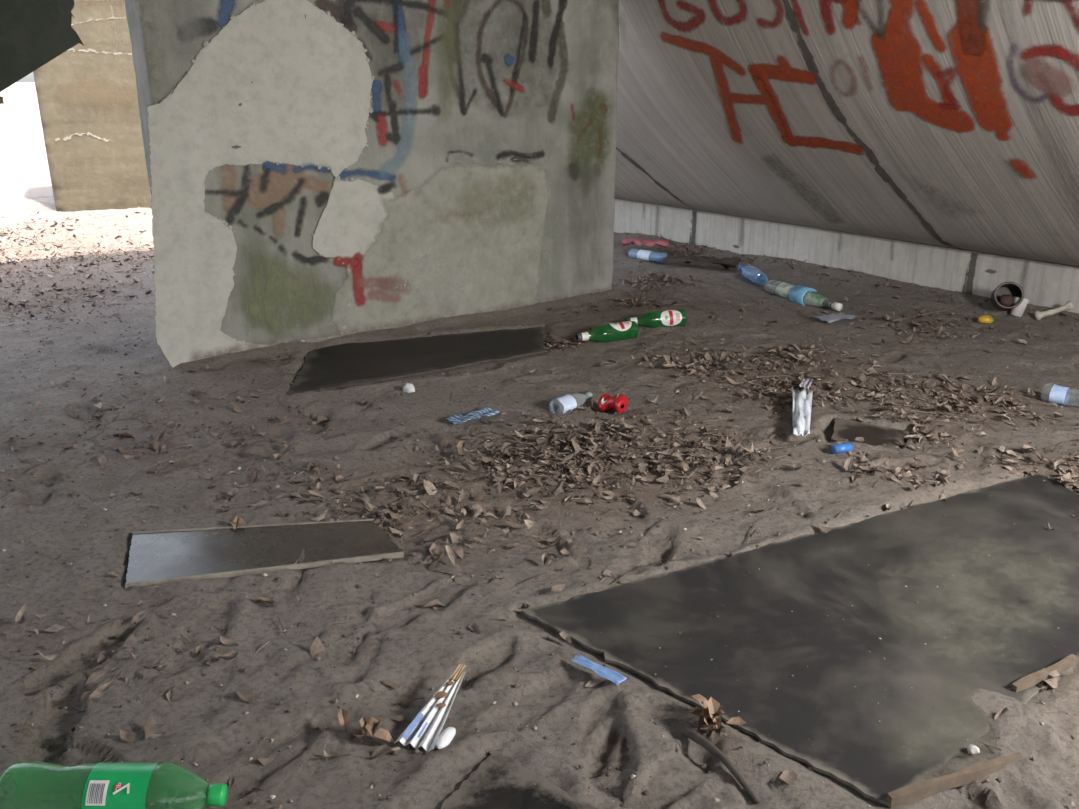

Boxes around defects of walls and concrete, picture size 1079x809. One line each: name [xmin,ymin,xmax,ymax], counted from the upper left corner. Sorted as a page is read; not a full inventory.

peeling [147,0,549,368]